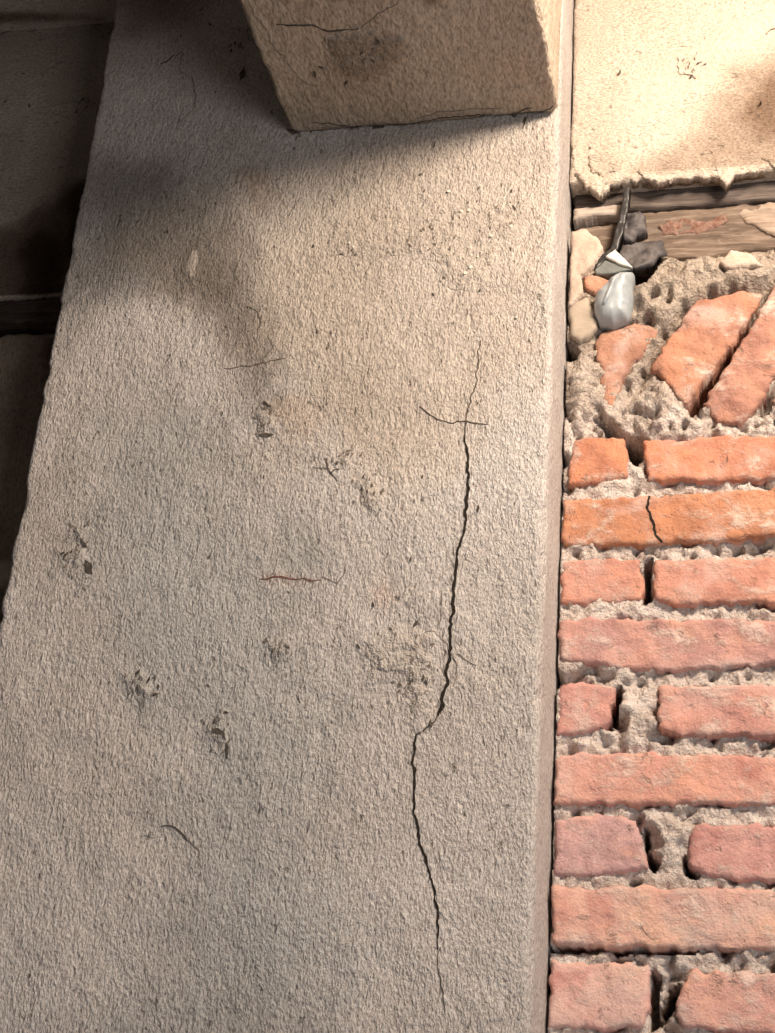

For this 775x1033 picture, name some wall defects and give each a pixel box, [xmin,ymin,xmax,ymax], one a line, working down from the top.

crack [411,340,487,1012]
crack [646,496,662,543]